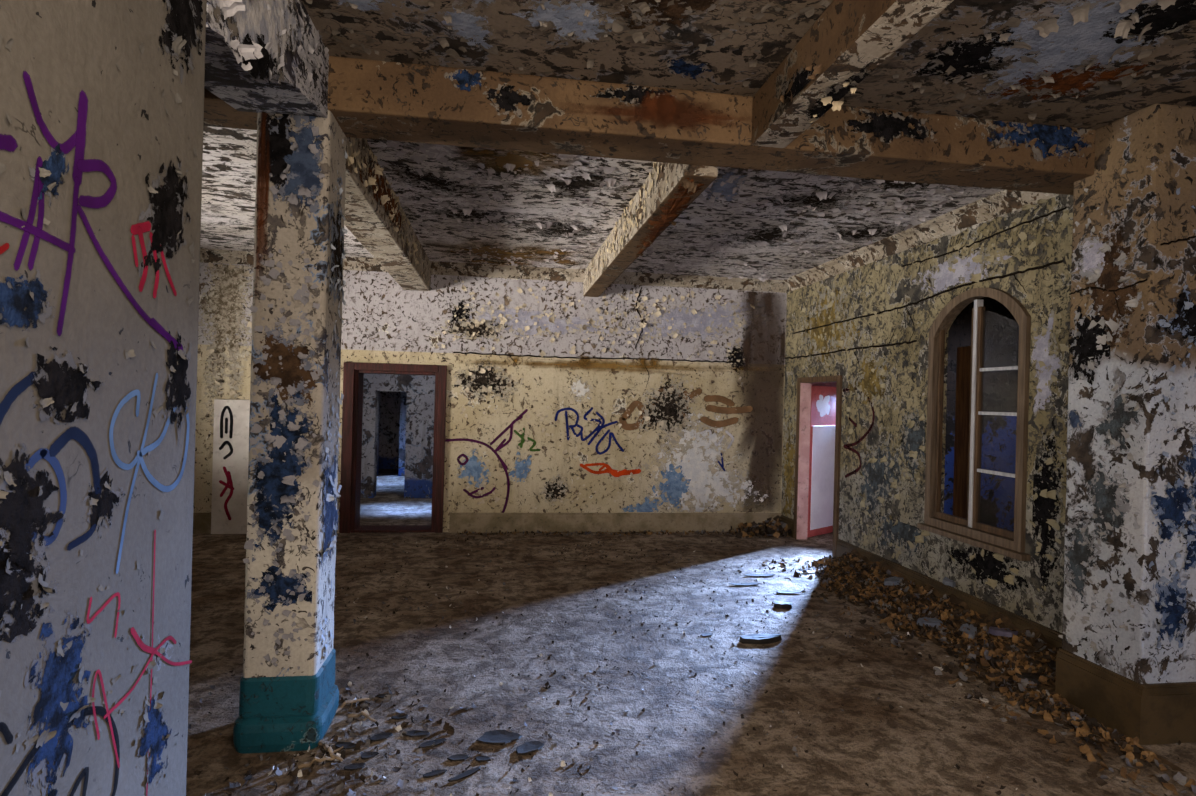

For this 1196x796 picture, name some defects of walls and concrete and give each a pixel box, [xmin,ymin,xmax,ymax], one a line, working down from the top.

peeling [139,0,830,118]
peeling [138,113,1196,670]
peeling [0,443,177,796]